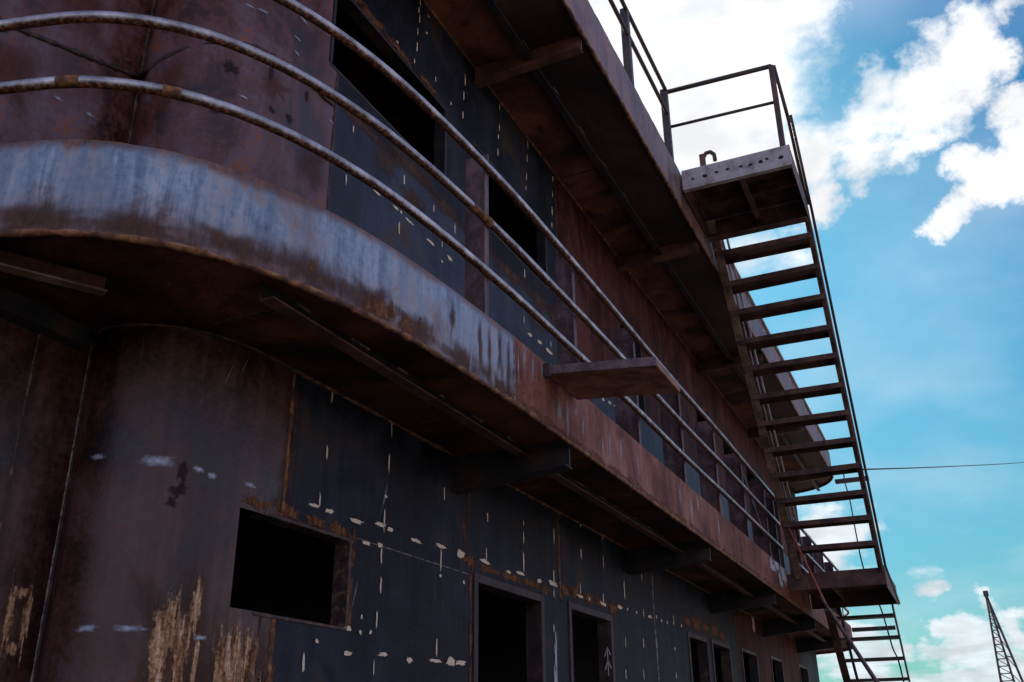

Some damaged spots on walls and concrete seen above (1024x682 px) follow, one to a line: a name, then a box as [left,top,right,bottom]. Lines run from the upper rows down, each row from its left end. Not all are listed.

rust [64,0,100,11]
rust [0,49,27,81]
rust [54,75,80,89]
rust [405,188,422,208]
rust [2,206,72,230]
rust [93,214,166,238]
rust [193,225,258,260]
rust [276,248,511,394]
rust [243,496,356,627]
rust [462,554,617,682]
peeling [213,623,259,682]